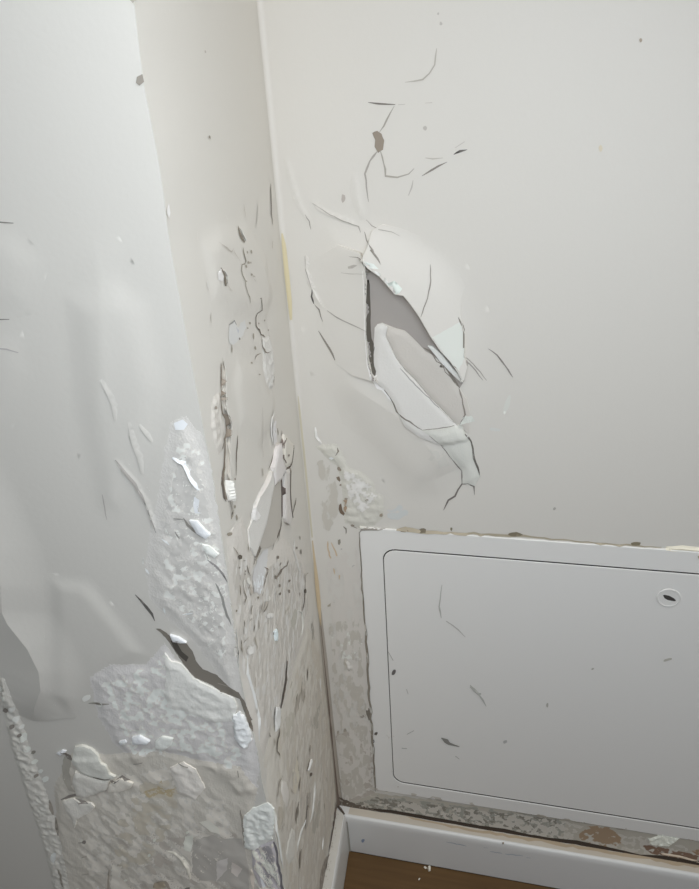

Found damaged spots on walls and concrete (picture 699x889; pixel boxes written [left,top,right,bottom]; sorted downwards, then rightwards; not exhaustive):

crack [210,242,269,359]
peeling [304,224,480,486]
crack [305,102,487,509]
crack [221,371,238,519]
peeling [314,427,384,529]
peeling [0,392,347,889]
crack [115,428,308,755]
crack [343,526,699,865]
crack [49,794,88,836]
crack [273,842,289,889]
crack [324,803,558,889]
flaking render [648,835,680,846]